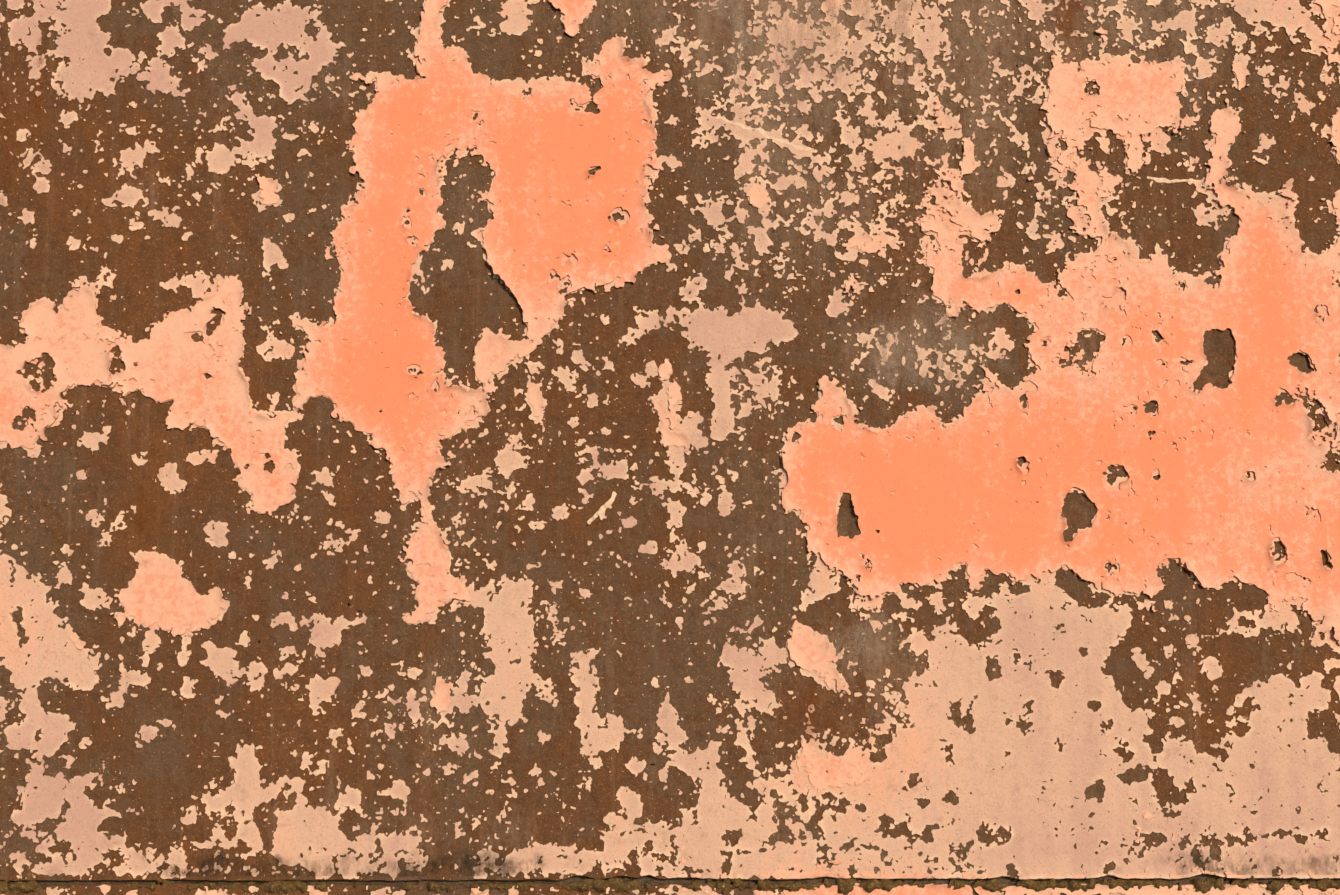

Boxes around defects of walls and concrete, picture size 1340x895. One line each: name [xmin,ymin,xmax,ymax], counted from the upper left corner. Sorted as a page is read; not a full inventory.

spalling [1082,77,1100,97]
peeling [16,353,57,399]
peeling [185,301,230,366]
peeling [1051,312,1141,379]
peeling [1098,278,1172,346]
spalling [1112,328,1237,429]
spalling [251,430,276,474]
peeling [1095,461,1135,497]
spalling [836,492,861,539]
spalling [1061,487,1111,548]
spalling [1268,525,1311,587]
spalling [1320,550,1333,570]